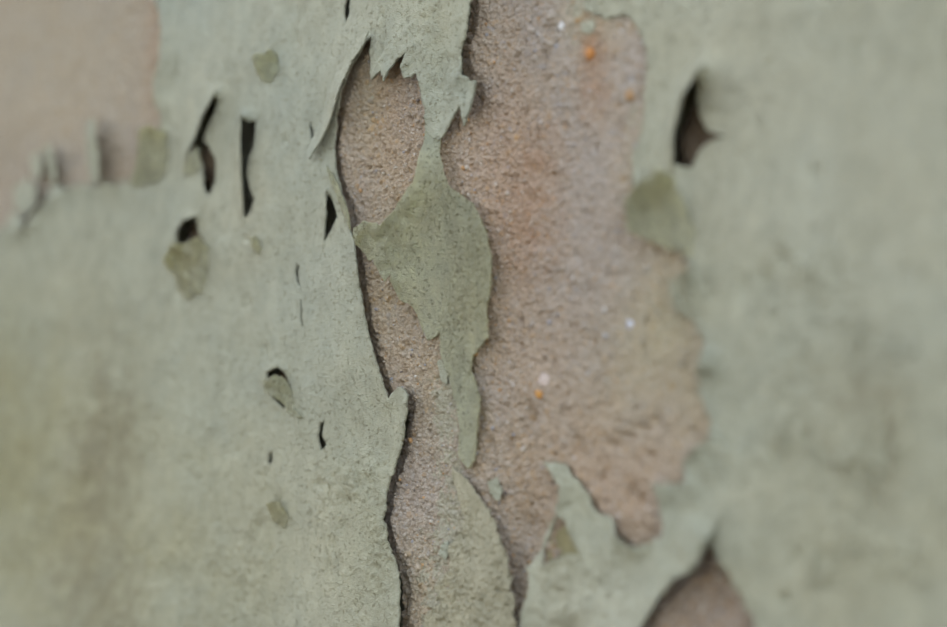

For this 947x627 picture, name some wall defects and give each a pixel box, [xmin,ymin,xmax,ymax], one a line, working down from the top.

peeling [251,49,279,83]
peeling [0,0,169,234]
peeling [184,144,216,188]
peeling [678,94,724,168]
peeling [163,221,210,301]
peeling [307,0,710,627]
peeling [263,370,301,418]
peeling [642,544,755,627]